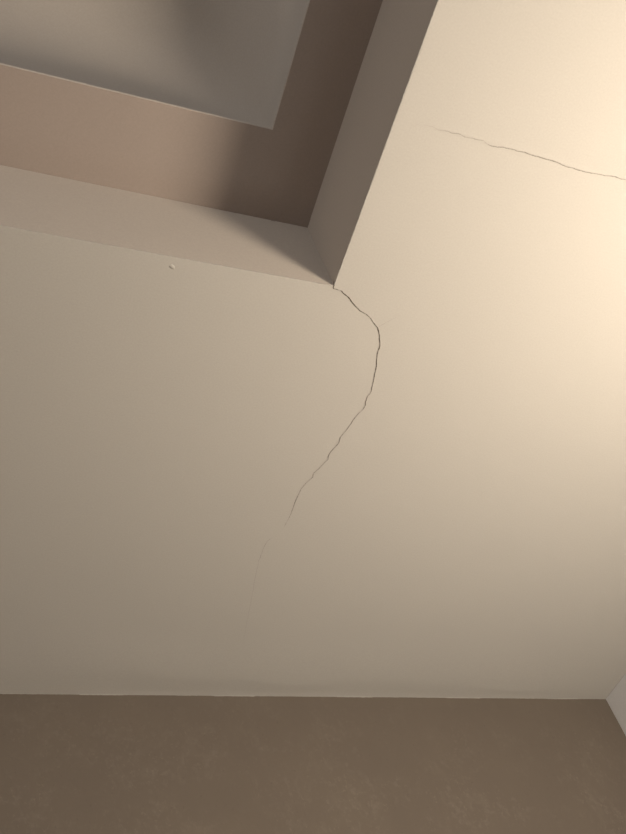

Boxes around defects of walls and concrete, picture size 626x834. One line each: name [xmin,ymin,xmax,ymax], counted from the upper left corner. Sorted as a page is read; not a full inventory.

crack [328,282,380,457]